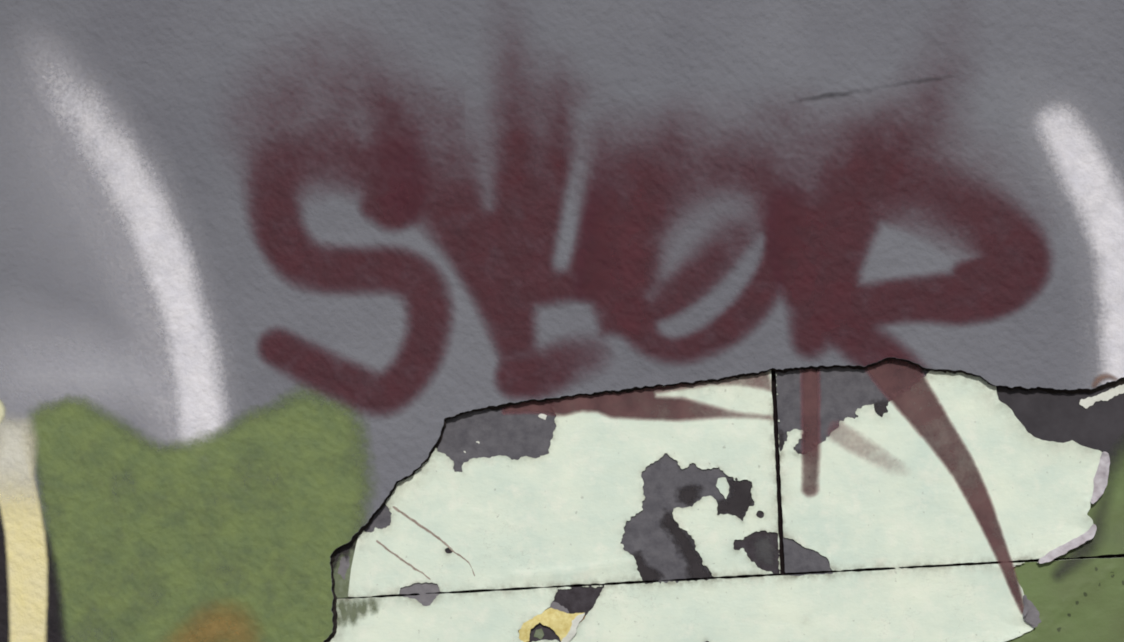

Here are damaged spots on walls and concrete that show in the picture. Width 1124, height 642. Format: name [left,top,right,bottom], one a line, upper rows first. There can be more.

spalling [324,357,1124,642]